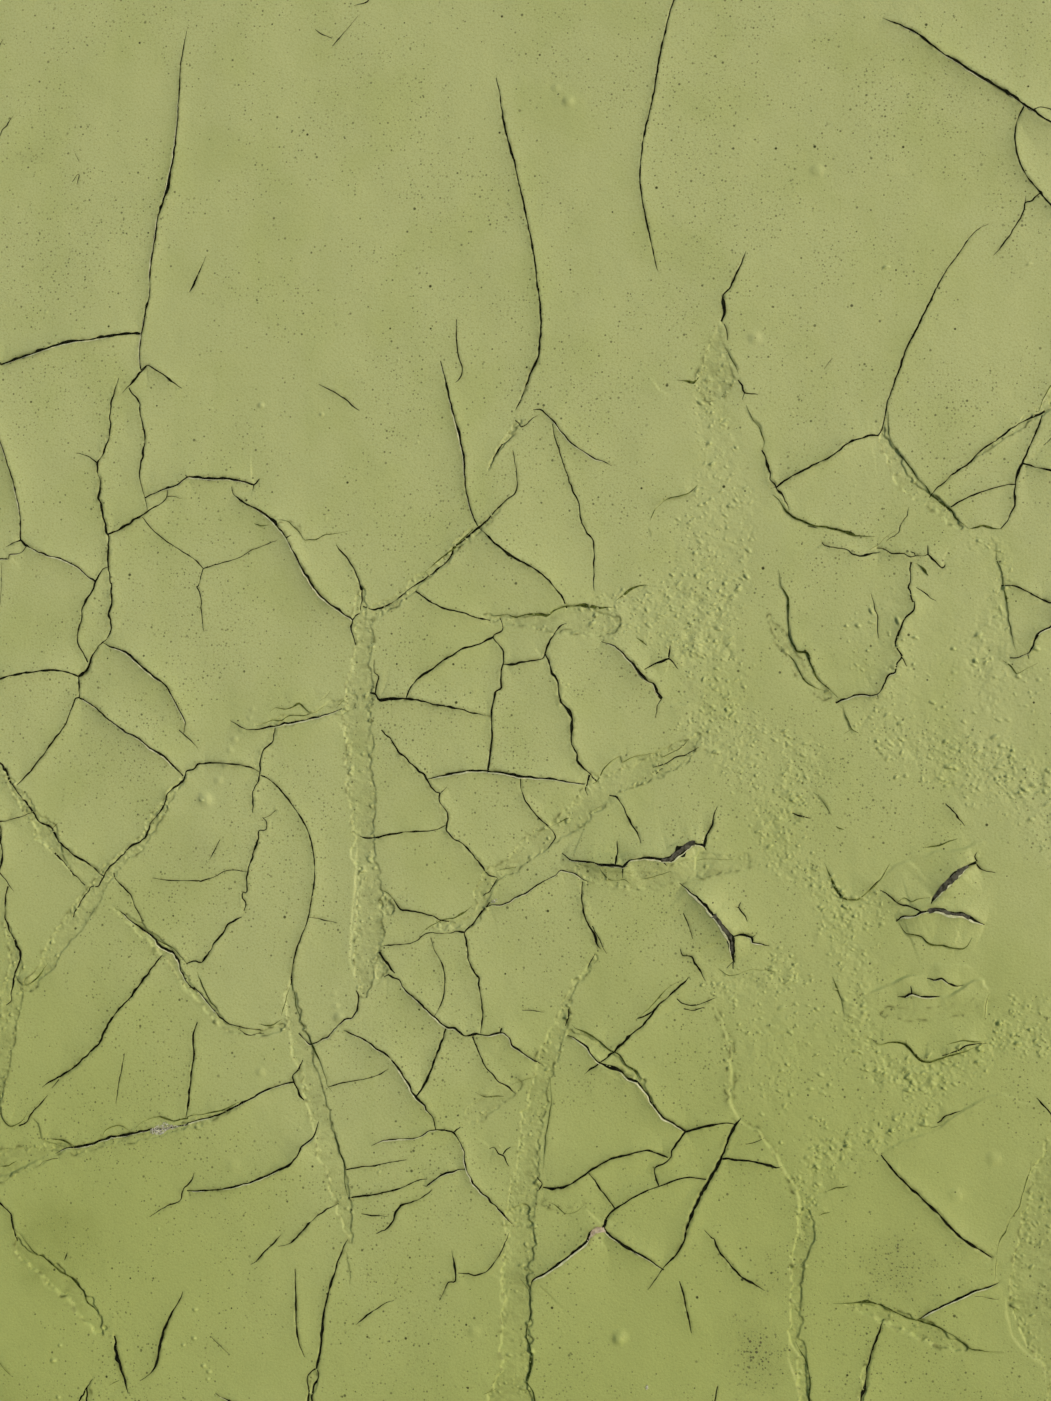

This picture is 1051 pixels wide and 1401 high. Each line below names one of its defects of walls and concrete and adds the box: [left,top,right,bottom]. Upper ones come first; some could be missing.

peeling [487,420,522,471]
crack [761,19,1051,703]
peeling [970,385,1051,461]
crack [0,0,782,1401]
peeling [766,414,1051,873]
crack [869,803,995,925]
peeling [421,576,1035,1401]
crack [898,978,963,999]
crack [881,1155,999,1319]
crack [860,1319,884,1401]